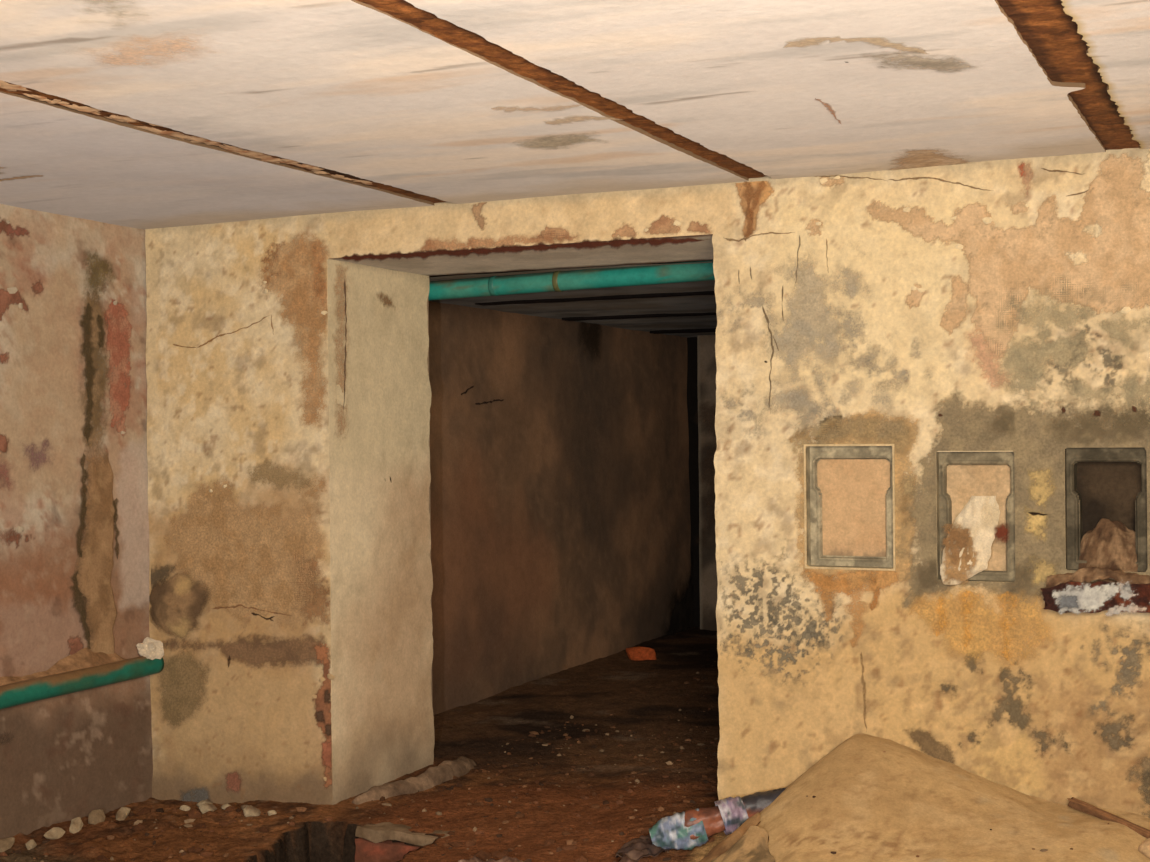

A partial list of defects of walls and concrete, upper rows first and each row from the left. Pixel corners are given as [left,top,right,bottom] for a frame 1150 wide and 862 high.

corrosion [357,0,774,241]
crack [815,175,991,191]
crack [1041,168,1088,196]
corrosion [997,0,1140,150]
peeling [263,235,328,424]
corrosion [311,233,708,302]
crack [725,232,829,408]
flaking render [868,150,1150,358]
damp [725,564,845,677]
flaking render [312,662,334,788]
damp [910,730,980,763]
damp [990,662,1068,751]